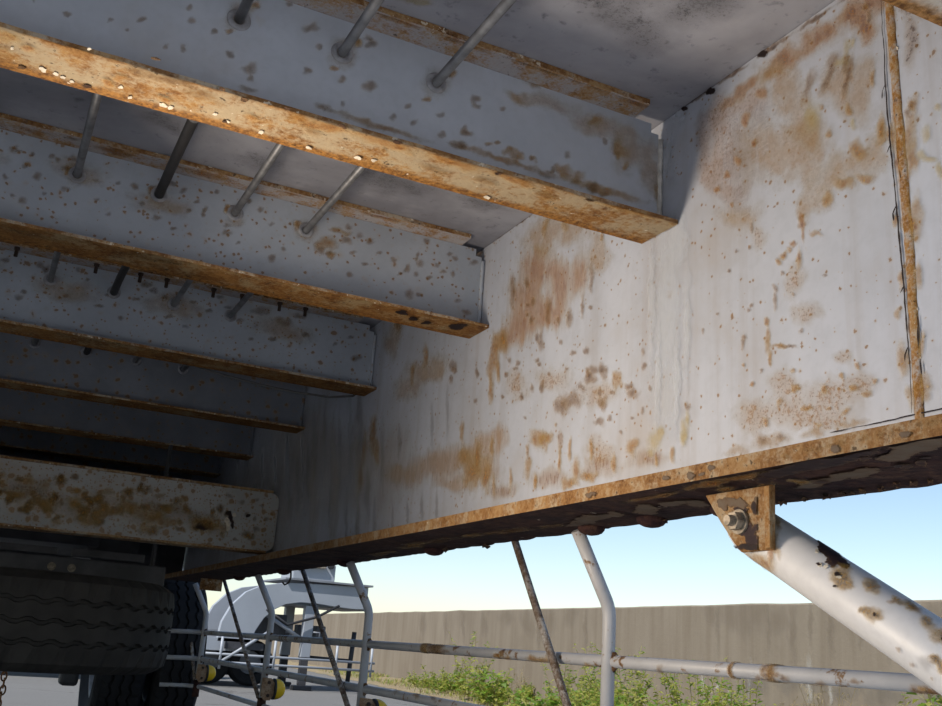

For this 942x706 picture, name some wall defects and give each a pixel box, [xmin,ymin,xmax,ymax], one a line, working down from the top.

rust [757,0,885,75]
rust [681,87,715,111]
crack [830,5,942,433]
rust [394,310,433,327]
rust [477,308,550,401]
rust [741,355,875,432]
rust [527,425,616,488]
peeling [756,431,942,502]
rust [0,473,234,537]
peeling [564,497,757,527]